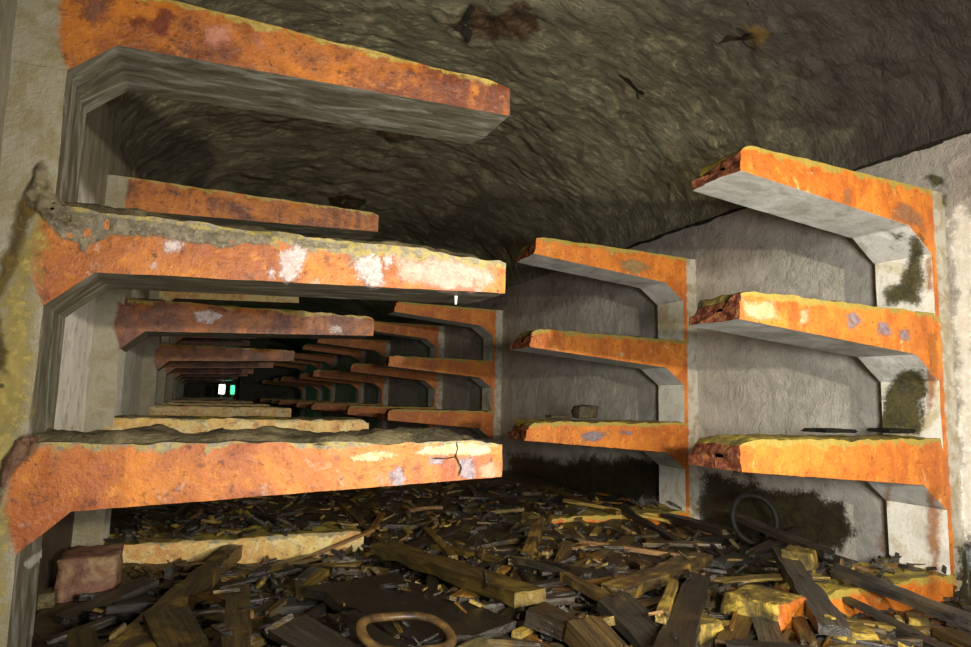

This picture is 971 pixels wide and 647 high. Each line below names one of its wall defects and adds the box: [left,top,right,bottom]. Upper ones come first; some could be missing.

spalling [23,162,271,252]
spalling [328,194,367,210]
peeling [267,239,347,285]
mould [883,233,925,307]
damp [0,197,45,475]
mould [883,369,927,436]
corrosion [928,334,938,407]
damp [947,204,971,598]
corrosion [927,490,939,594]